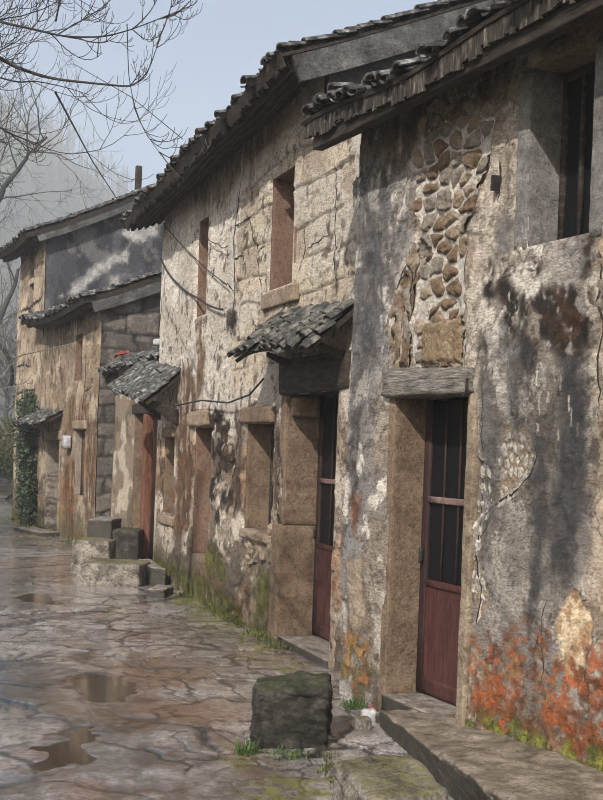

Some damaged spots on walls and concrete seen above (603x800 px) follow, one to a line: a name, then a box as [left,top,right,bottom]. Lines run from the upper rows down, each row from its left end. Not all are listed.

crack [221,173,264,325]
crack [294,166,337,297]
peeling [353,158,362,213]
flaking render [381,90,496,368]
leakage [583,235,594,277]
crack [595,256,603,419]
leakage [479,371,502,539]
crack [476,388,537,635]
leakage [483,262,594,628]
corrosion [344,628,369,693]
corrosion [468,633,603,764]
flaking render [551,587,594,693]